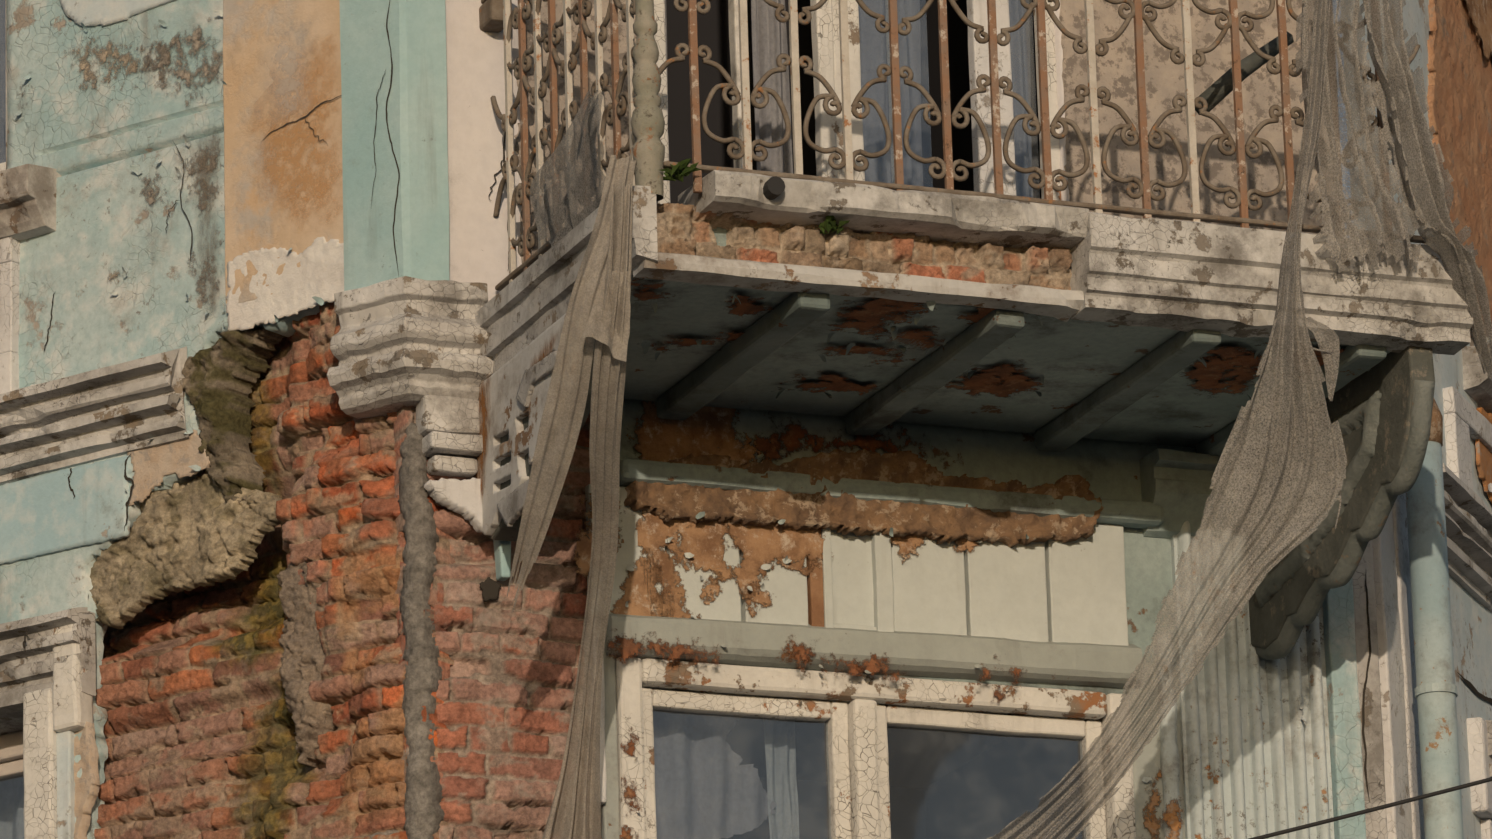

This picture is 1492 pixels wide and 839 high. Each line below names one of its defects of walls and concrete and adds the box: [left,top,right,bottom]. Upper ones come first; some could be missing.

peeling [71,10,227,106]
crack [262,1,400,275]
spalling [1427,0,1492,341]
peeling [185,237,344,331]
spalling [656,203,1073,399]
spalling [89,427,282,629]
spalling [277,562,338,768]
spalling [479,577,501,602]
peeling [607,501,834,665]
peeling [872,528,928,564]
crack [1362,577,1371,803]
spalling [1142,770,1183,839]